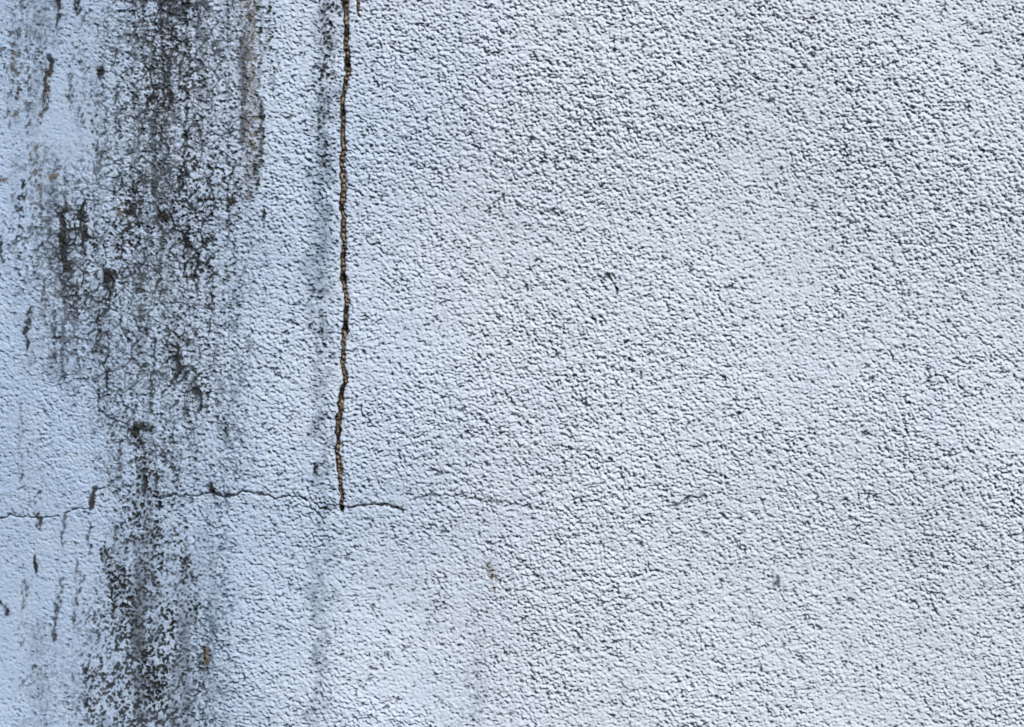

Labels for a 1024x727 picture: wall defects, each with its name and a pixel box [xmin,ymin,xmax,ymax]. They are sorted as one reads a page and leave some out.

damp [0,30,54,133]
damp [15,145,40,242]
crack [152,0,519,519]
damp [23,278,45,350]
damp [40,0,252,727]
damp [0,554,38,615]